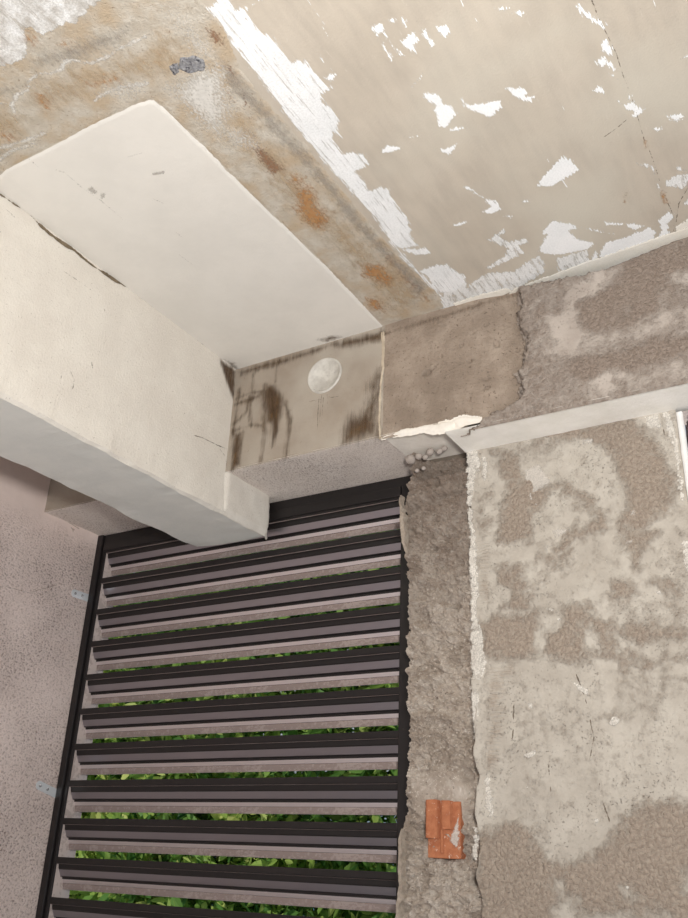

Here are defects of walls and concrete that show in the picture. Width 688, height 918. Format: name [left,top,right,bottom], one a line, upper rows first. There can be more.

corrosion [253,146,282,174]
corrosion [294,178,324,227]
spalling [0,0,688,439]
damp [326,332,381,346]
damp [221,361,290,437]
damp [346,386,378,441]
damp [232,429,242,469]